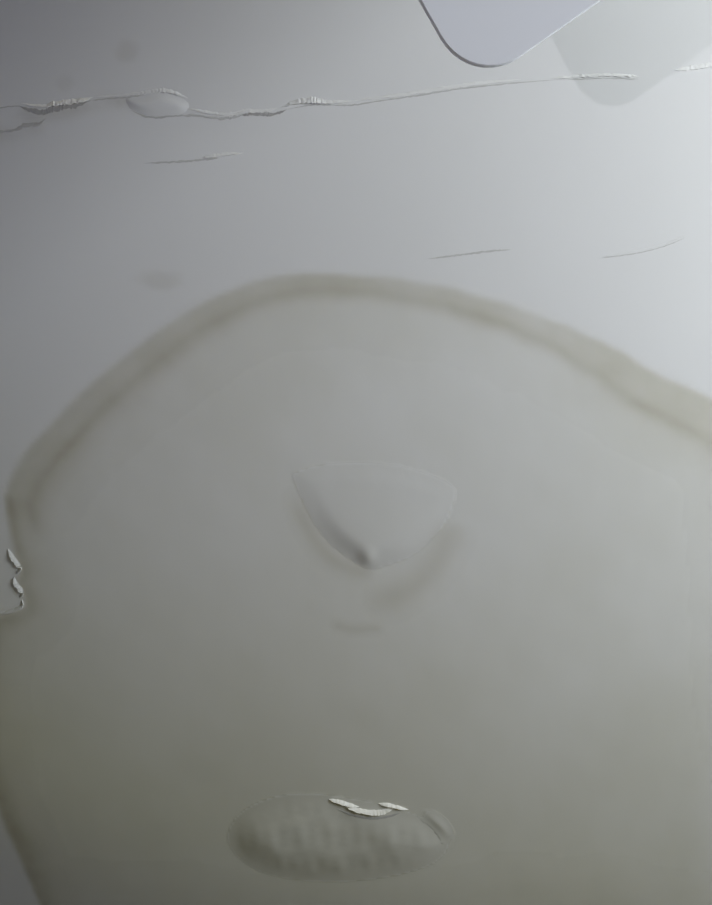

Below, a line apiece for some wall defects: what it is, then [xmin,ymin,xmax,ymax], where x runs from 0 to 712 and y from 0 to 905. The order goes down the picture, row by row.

crack [0,73,639,133]
peeling [329,799,409,820]